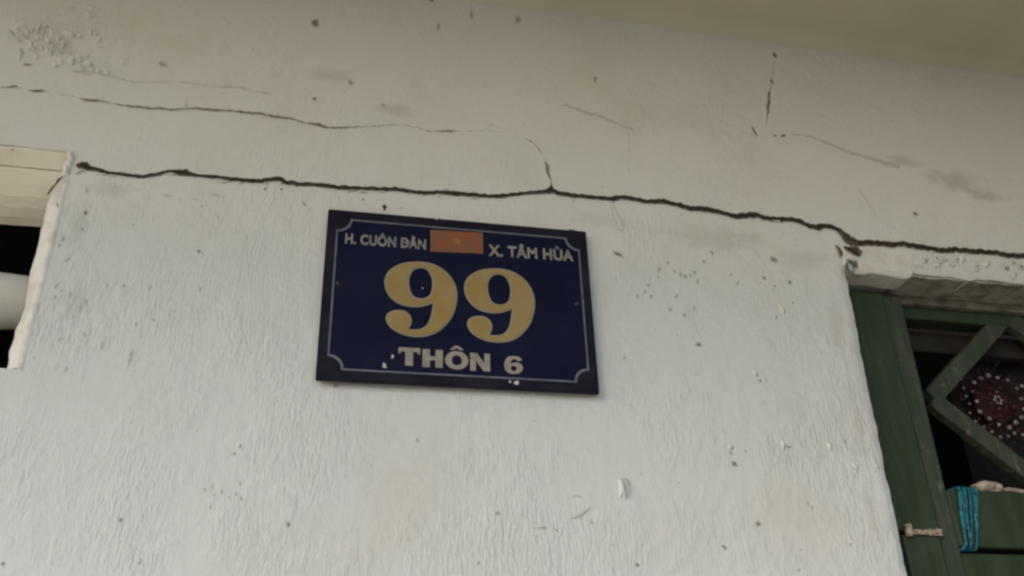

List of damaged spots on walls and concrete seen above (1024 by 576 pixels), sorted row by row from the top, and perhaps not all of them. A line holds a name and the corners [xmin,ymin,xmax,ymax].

crack [0,85,453,132]
crack [752,52,785,137]
crack [47,138,1024,259]